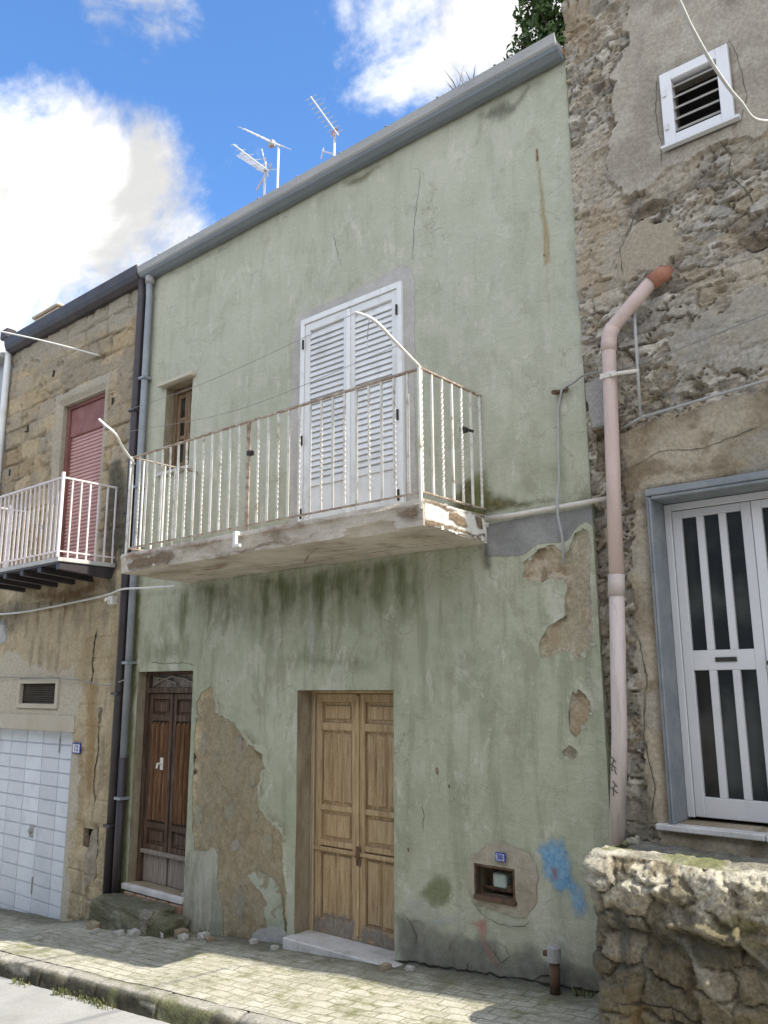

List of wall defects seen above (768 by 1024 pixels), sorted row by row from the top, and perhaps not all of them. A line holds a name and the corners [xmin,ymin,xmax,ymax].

crack [412,171,424,256]
spalling [629,199,666,221]
spalling [737,226,768,252]
crack [631,426,759,468]
peeling [397,499,489,541]
peeling [524,529,597,659]
peeling [563,689,592,761]
crack [92,723,100,802]
peeling [192,686,287,939]